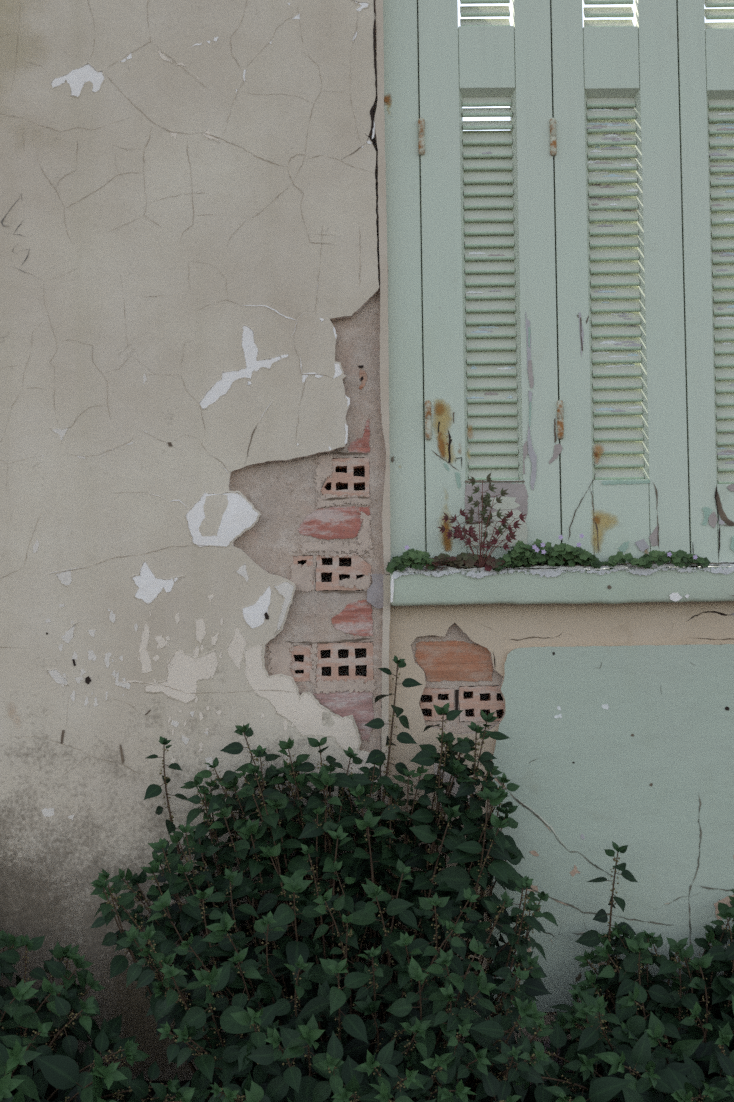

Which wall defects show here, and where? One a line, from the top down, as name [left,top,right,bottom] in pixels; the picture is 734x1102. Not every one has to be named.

peeling [50,61,106,99]
crack [344,7,377,183]
peeling [198,324,290,411]
crack [241,305,322,375]
peeling [302,362,344,382]
crack [240,402,272,459]
corrosion [435,402,460,461]
peeling [184,491,261,549]
corrosion [593,513,615,548]
peeling [46,559,379,797]
crack [494,775,614,877]
crack [532,792,732,945]